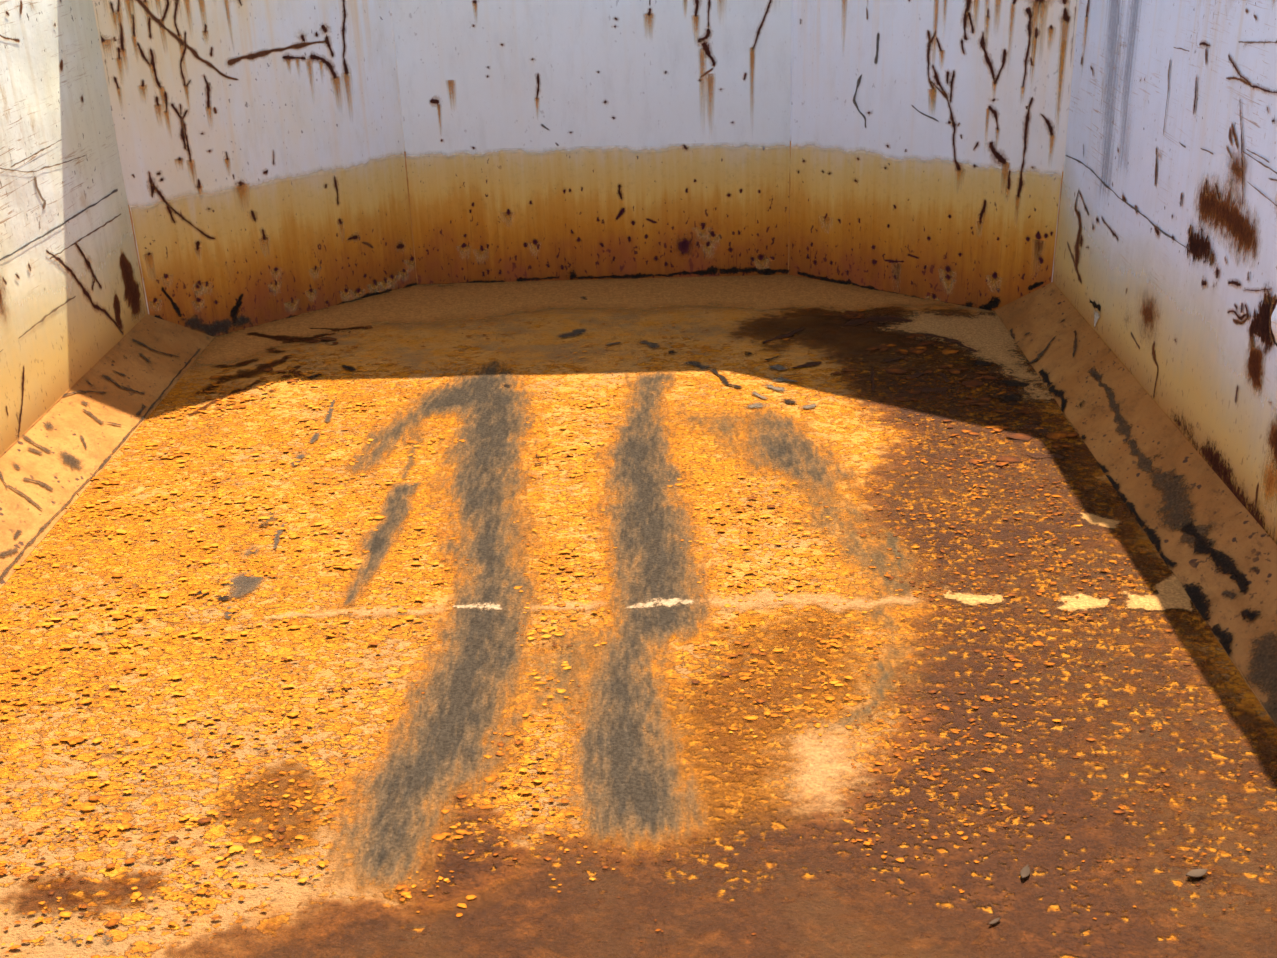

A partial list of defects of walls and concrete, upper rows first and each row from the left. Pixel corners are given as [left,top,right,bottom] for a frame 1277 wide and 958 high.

corrosion [101,0,159,96]
corrosion [1060,0,1070,90]
corrosion [430,80,454,121]
corrosion [0,139,1277,544]
damp [165,306,1277,958]
corrosion [217,762,317,852]
corrosion [2,871,166,915]